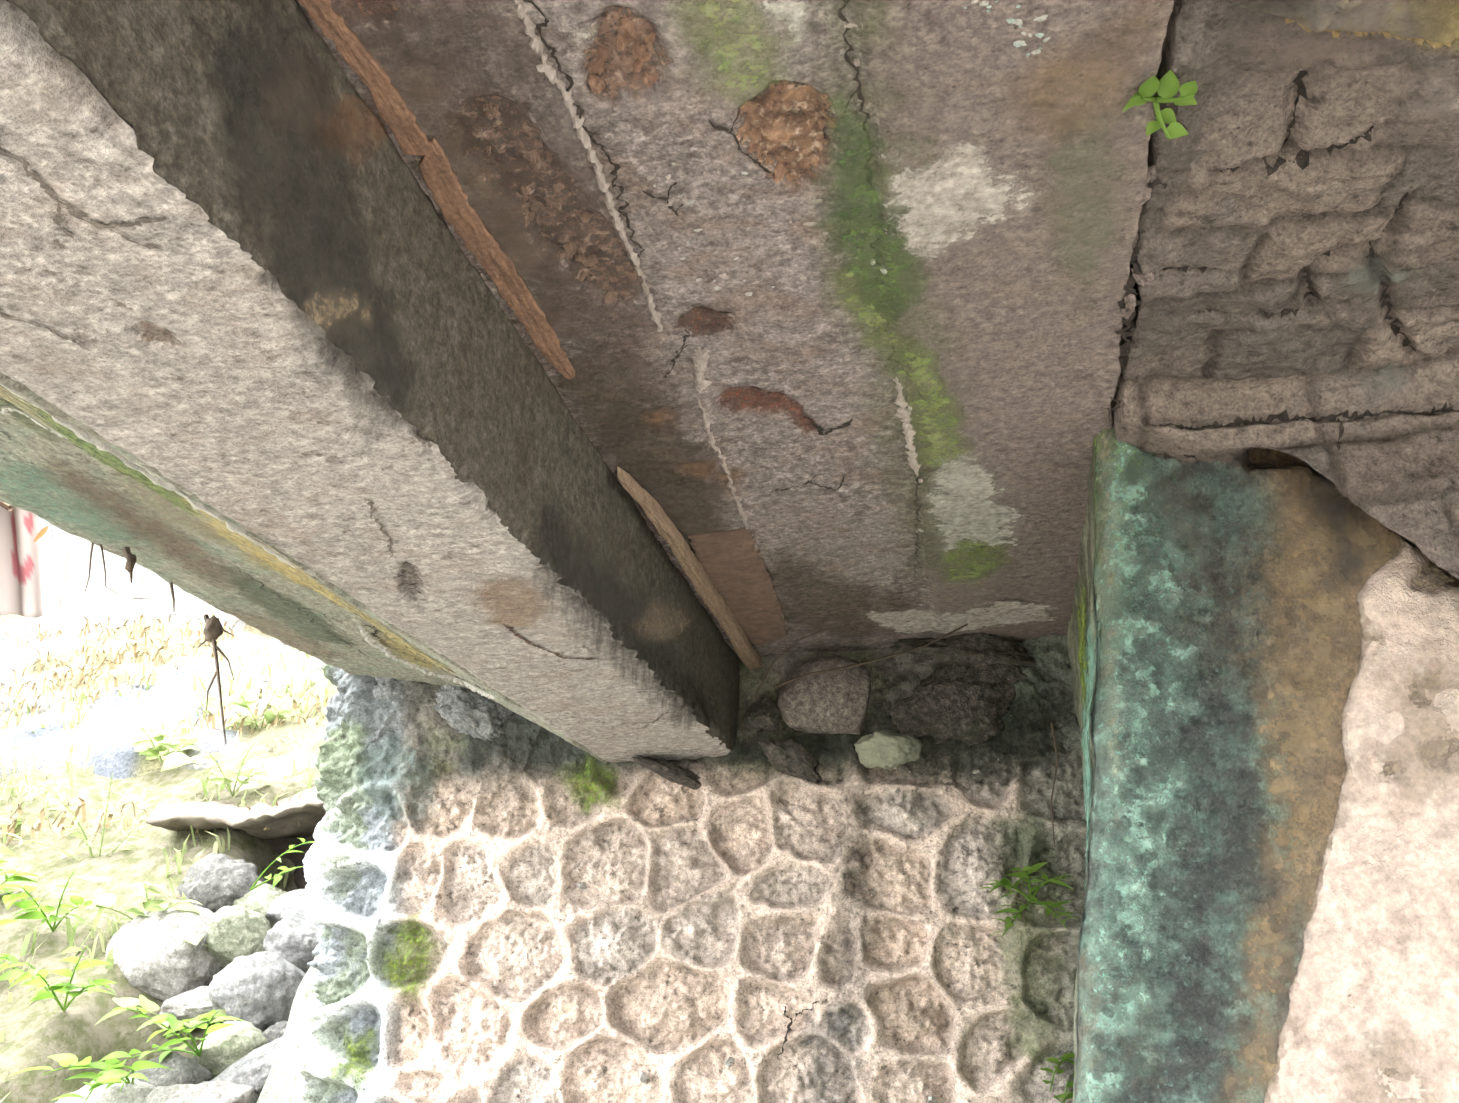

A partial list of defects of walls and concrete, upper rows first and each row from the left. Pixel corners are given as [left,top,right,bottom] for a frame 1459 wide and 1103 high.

crack [0,140,166,251]
spalling [454,93,642,307]
spalling [581,6,673,108]
peeling [647,162,781,296]
spalling [703,80,841,207]
water stain [763,0,806,42]
crack [838,0,875,189]
water stain [884,143,1035,257]
spalling [674,305,732,337]
rust [716,386,852,436]
crack [870,239,924,581]
water stain [926,452,1022,552]